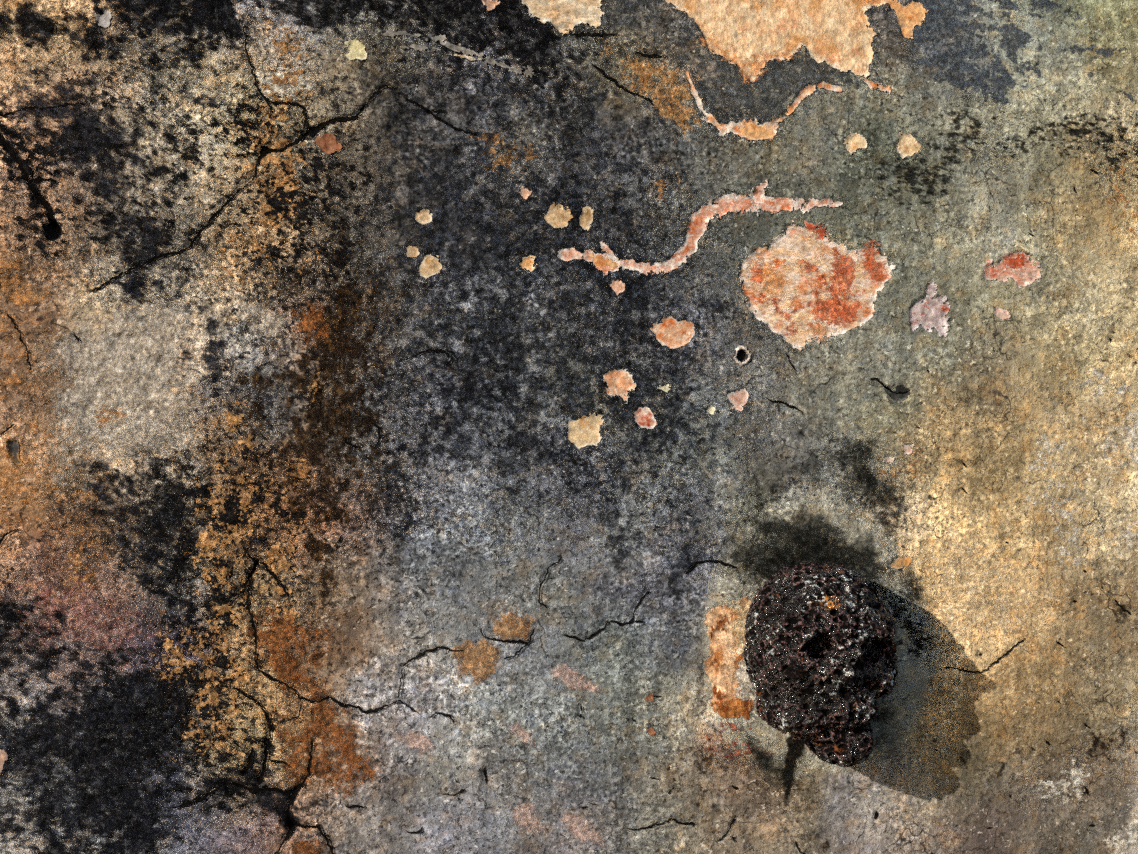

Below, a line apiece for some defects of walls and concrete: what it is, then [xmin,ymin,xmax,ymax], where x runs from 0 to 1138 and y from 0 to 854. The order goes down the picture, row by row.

crack [0,102,84,229]
crack [90,26,478,292]
peeling [522,0,604,35]
peeling [685,72,842,141]
peeling [665,0,928,94]
leakage [855,95,1138,245]
peeling [557,179,896,351]
leakage [0,0,736,854]
crack [562,591,649,641]
corrosion [239,607,378,799]
crack [172,546,562,854]
corrosion [291,836,335,854]